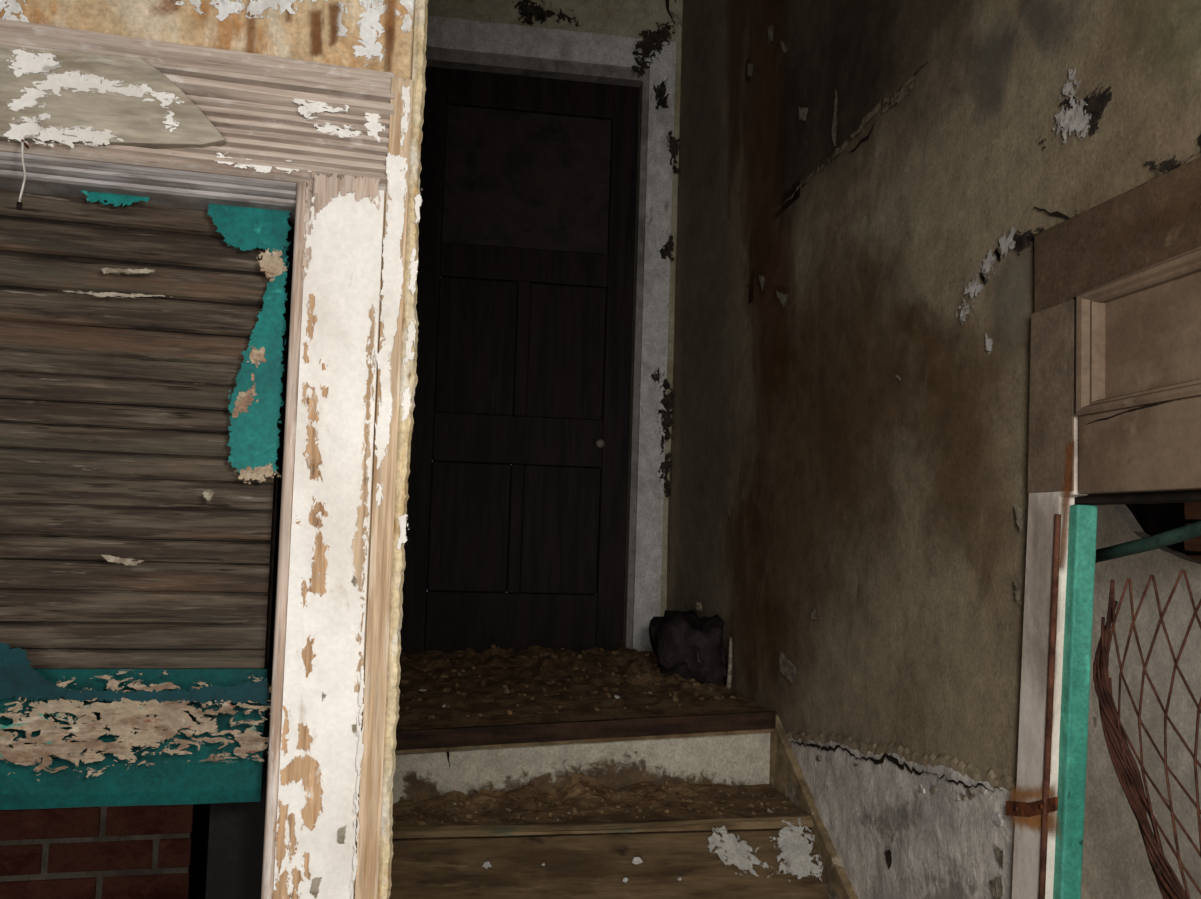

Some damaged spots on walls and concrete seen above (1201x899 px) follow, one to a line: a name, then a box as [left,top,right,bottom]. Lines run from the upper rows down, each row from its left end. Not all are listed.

peeling [0,0,30,23]
flaking render [512,0,579,28]
peeling [632,19,678,110]
peeling [1036,67,1113,150]
peeling [666,132,680,174]
flaking render [1144,154,1185,175]
peeling [659,235,677,261]
peeling [955,226,1044,333]
flaking render [175,0,428,899]
peeling [651,368,675,497]
flaking render [1184,502,1201,561]
crack [791,741,1003,793]